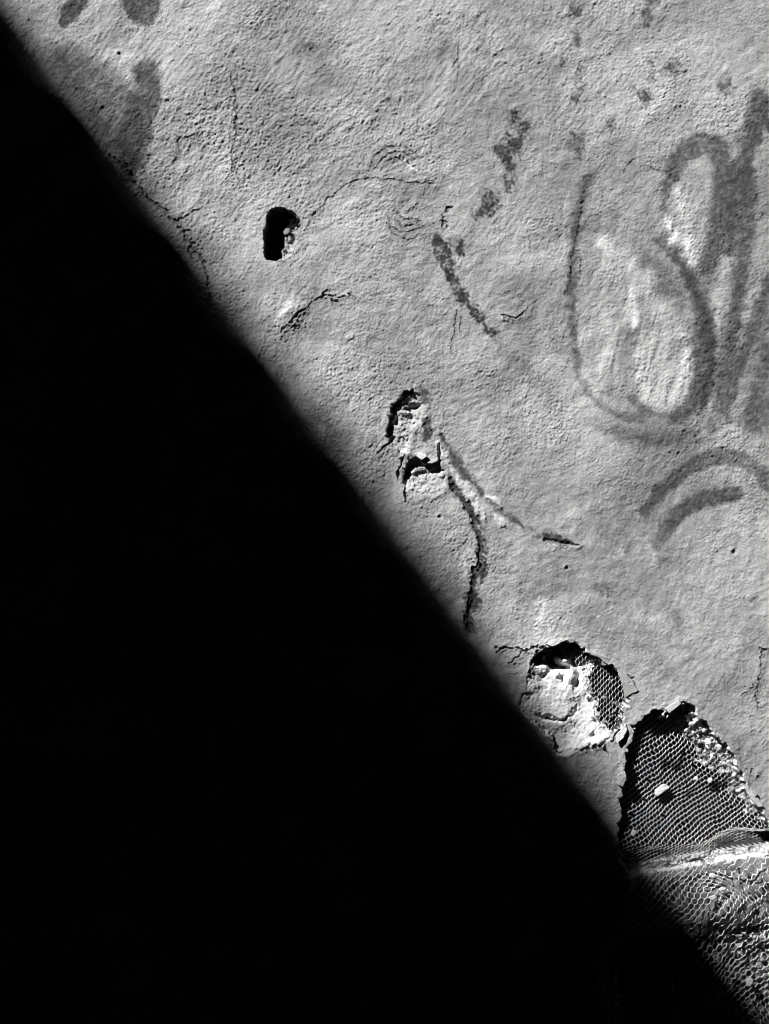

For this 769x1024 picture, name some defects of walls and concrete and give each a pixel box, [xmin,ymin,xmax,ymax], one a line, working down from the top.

spalling [262,206,303,262]
crack [305,144,454,242]
crack [278,289,355,335]
crack [376,423,408,503]
spalling [388,387,448,500]
crack [437,444,484,628]
spalling [517,638,769,1024]